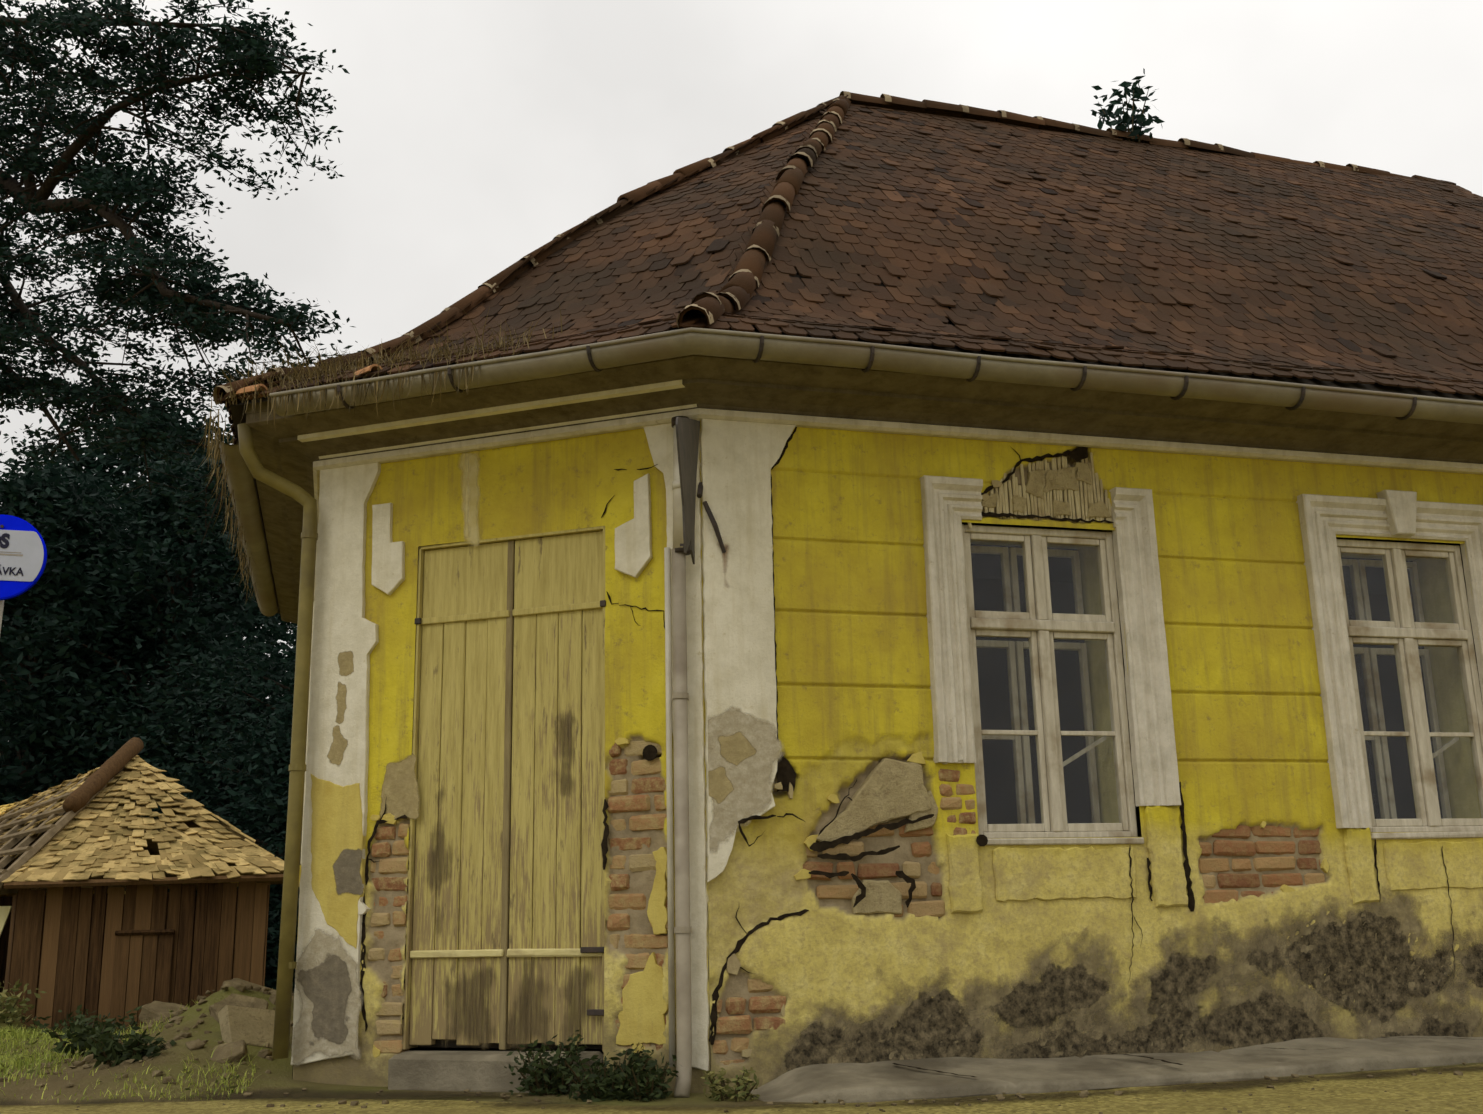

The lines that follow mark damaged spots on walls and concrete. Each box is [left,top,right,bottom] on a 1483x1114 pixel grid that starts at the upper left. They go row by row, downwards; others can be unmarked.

spalling [968,447,1112,528]
peeling [311,651,419,1058]
flaking render [607,737,669,1053]
peeling [708,707,797,851]
flaking render [794,752,988,917]
flaking render [1198,821,1329,903]
flaking render [712,953,786,1065]
crack [708,908,809,1045]
water stain [773,890,1483,1079]